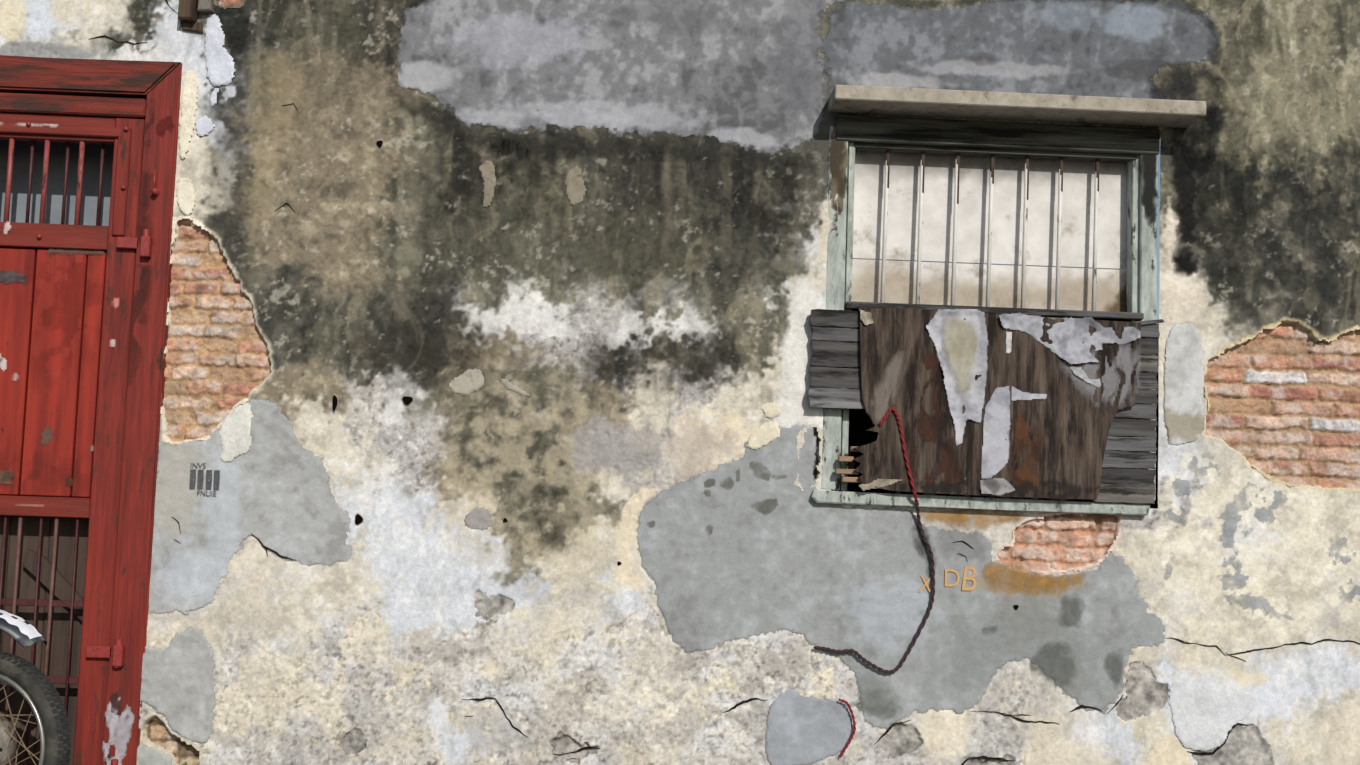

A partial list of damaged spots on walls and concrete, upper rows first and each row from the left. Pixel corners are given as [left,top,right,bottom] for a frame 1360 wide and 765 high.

water stain [214,7,248,50]
flaking render [156,0,244,159]
water stain [401,101,453,128]
water stain [1151,21,1360,299]
spalling [160,178,271,463]
spalling [1204,322,1360,490]
water stain [704,462,770,496]
water stain [758,498,777,514]
spalling [998,512,1121,573]
crack [1169,637,1360,661]